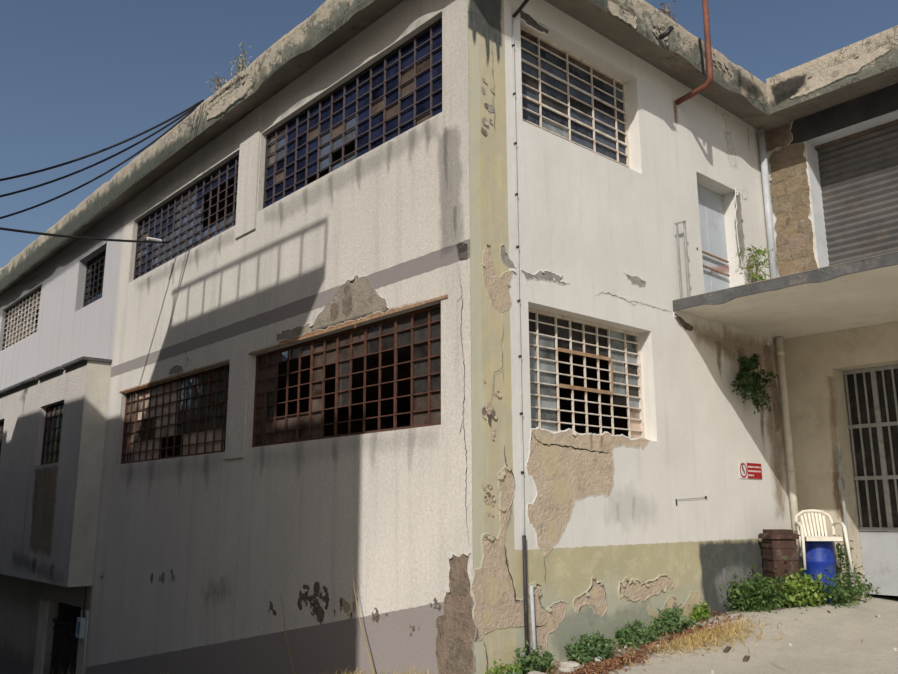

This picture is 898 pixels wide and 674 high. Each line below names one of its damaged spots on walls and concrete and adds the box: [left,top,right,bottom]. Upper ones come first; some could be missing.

damp [468,0,502,61]
spalling [765,121,819,277]
flaking render [276,274,390,342]
spalling [456,242,469,260]
flaking render [481,241,570,313]
flaking render [624,272,646,288]
damp [699,332,782,504]
damp [30,466,57,555]
flaking render [525,427,650,558]
flaking render [297,582,358,625]
flaking render [430,463,608,674]
flaking render [617,573,702,619]